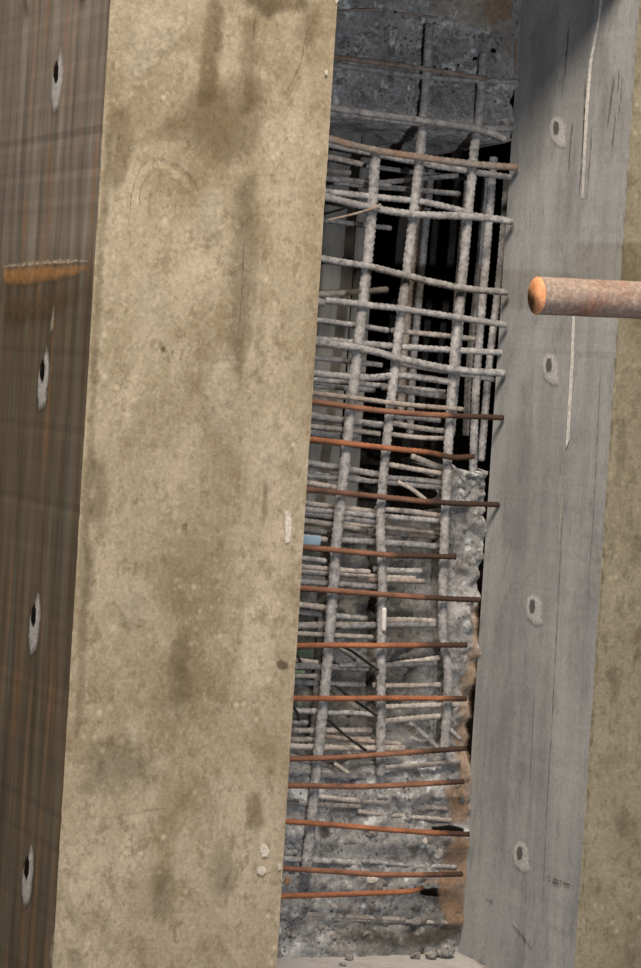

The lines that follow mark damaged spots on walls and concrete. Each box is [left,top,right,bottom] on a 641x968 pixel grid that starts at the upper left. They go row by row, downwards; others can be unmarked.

spalling [277,0,522,966]
corrosion [447,612,479,821]
corrosion [426,836,470,925]